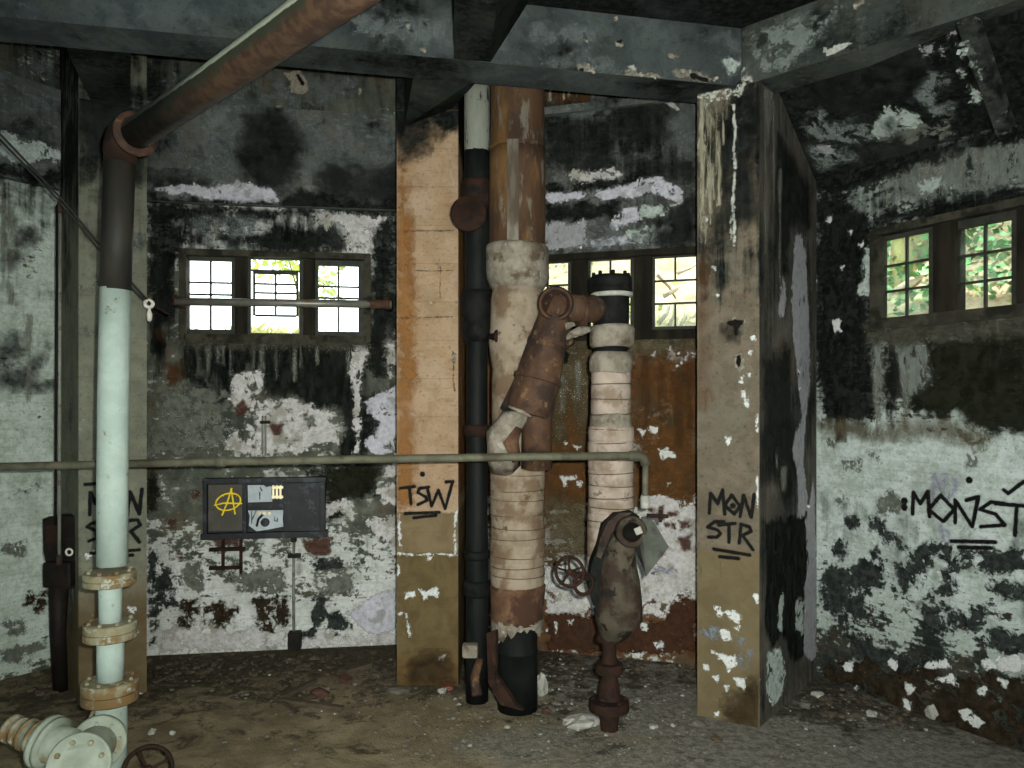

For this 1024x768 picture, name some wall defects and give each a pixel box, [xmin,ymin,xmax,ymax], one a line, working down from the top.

peeling [545,166,683,251]
damp [697,30,753,247]
damp [885,142,1024,205]
damp [180,342,369,401]
peeling [224,332,458,649]
rust [544,391,589,526]
rust [631,353,697,499]
peeling [777,230,1024,752]
damp [828,342,982,446]
peeling [127,547,291,654]
peeling [703,605,746,692]
damp [724,680,759,727]